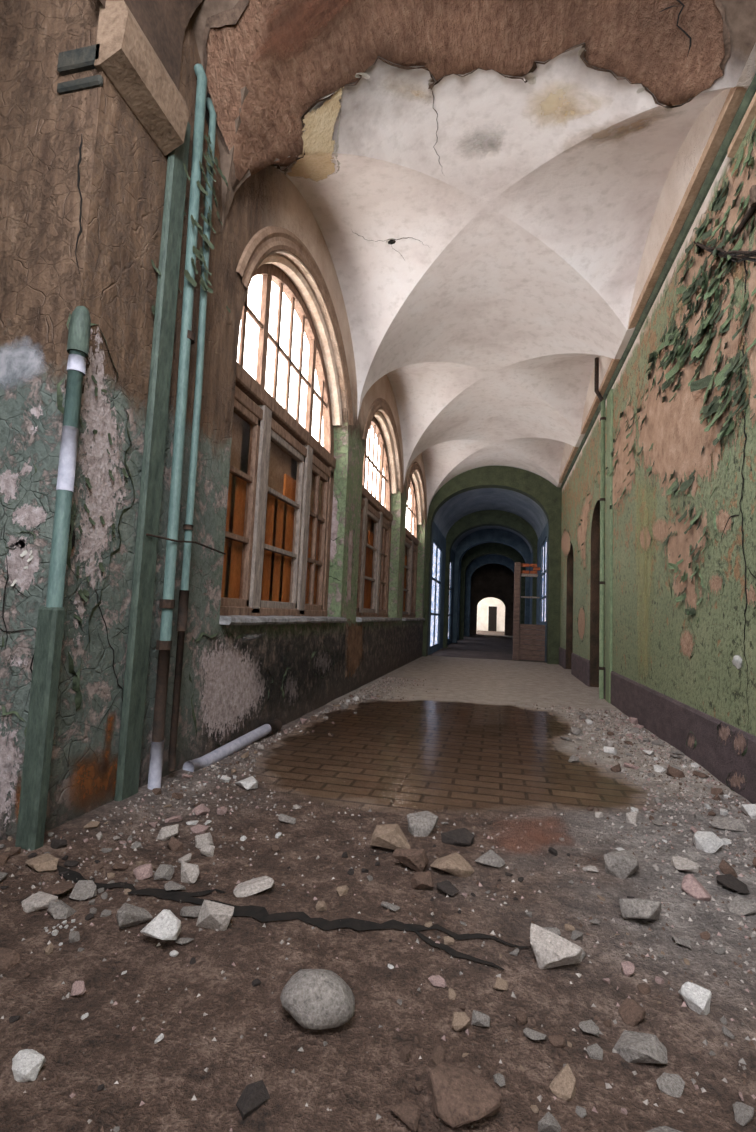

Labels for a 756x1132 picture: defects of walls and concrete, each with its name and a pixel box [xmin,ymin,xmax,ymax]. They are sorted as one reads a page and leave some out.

flaking render [178,0,731,293]
peeling [0,628,30,672]
crack [0,552,36,673]
peeling [0,377,66,595]
peeling [66,323,135,711]
peeling [561,123,756,660]
crack [721,260,756,732]
flaking render [0,705,27,840]
crack [57,865,531,970]